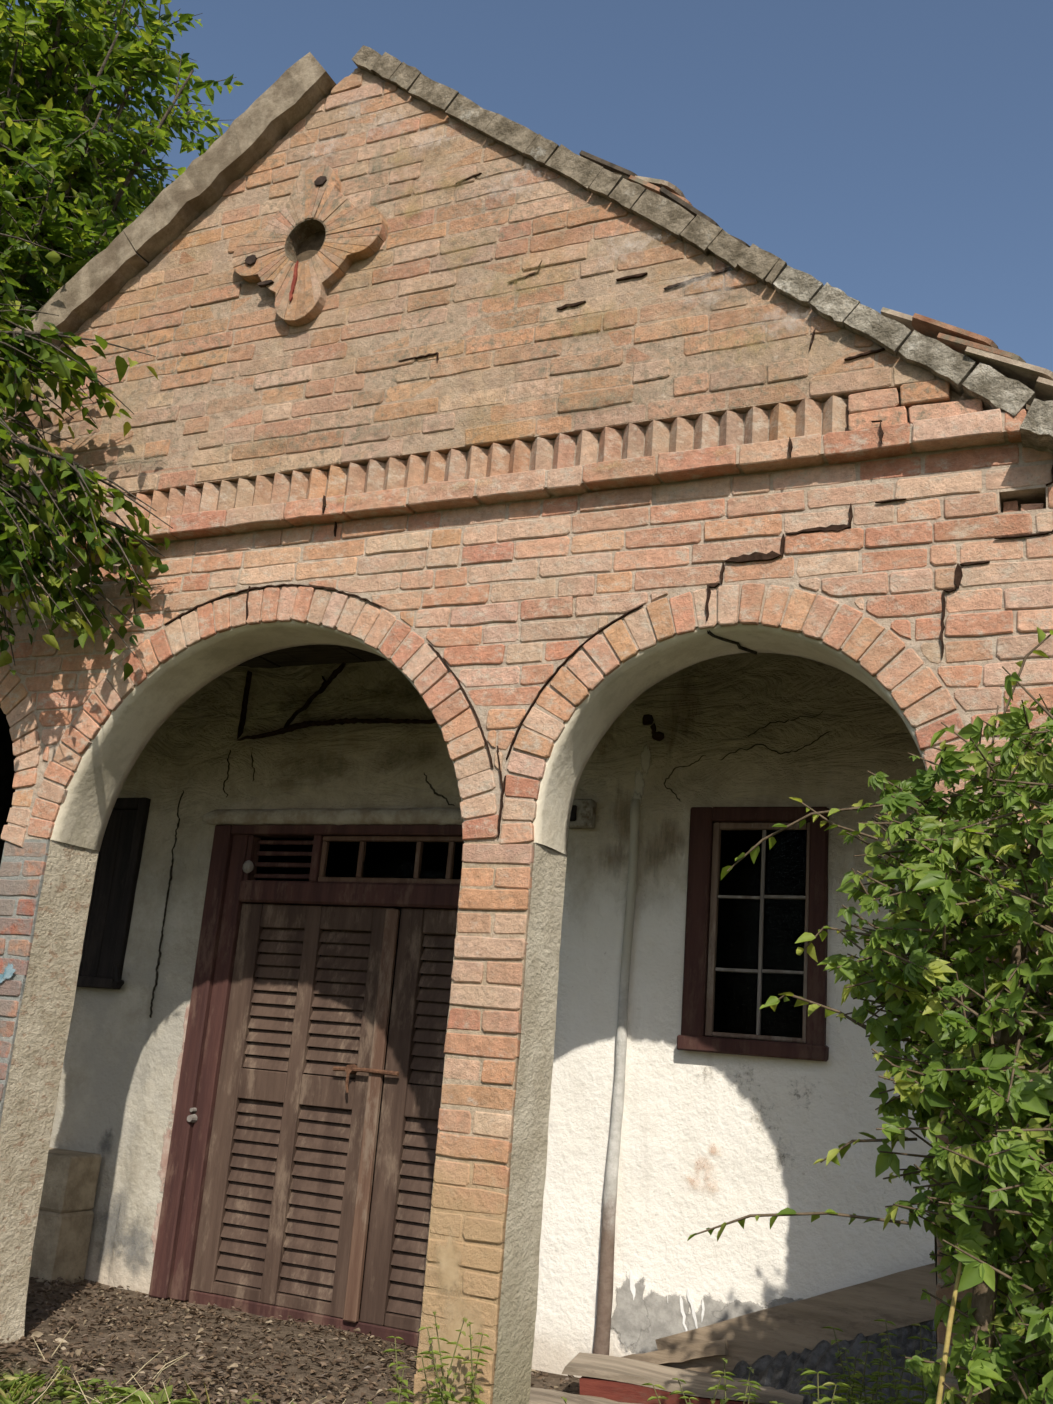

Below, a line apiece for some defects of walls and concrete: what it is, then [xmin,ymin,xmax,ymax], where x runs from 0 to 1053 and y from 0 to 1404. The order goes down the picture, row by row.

crack [164,583,381,626]
crack [705,498,906,655]
crack [223,662,437,797]
crack [424,605,643,837]
crack [664,711,830,801]
crack [149,791,184,1018]
peeling [0,963,16,983]
peeling [611,1272,804,1354]